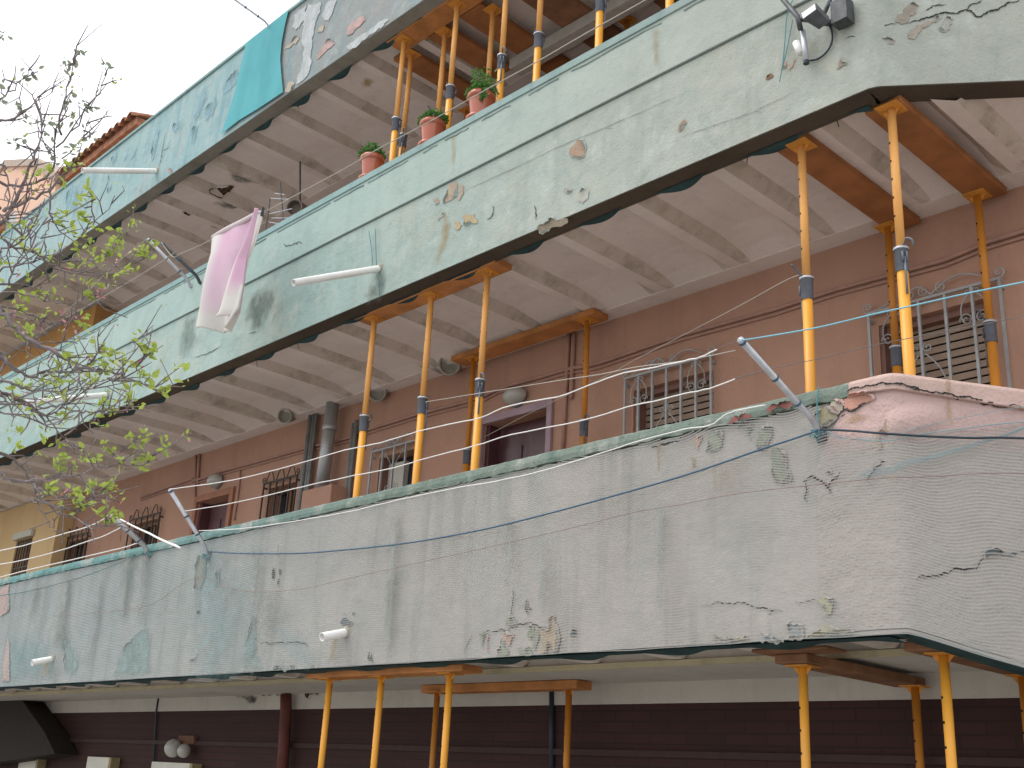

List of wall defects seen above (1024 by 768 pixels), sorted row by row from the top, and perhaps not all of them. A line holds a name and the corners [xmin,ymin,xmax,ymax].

peeling [896,0,953,39]
crack [885,0,1019,26]
peeling [284,0,388,92]
peeling [569,139,587,160]
peeling [433,181,464,221]
spalling [537,216,568,235]
peeling [813,390,875,427]
crack [829,382,1022,417]
crack [803,475,839,499]
crack [918,558,984,578]
crack [712,599,816,615]
peeling [479,601,576,656]